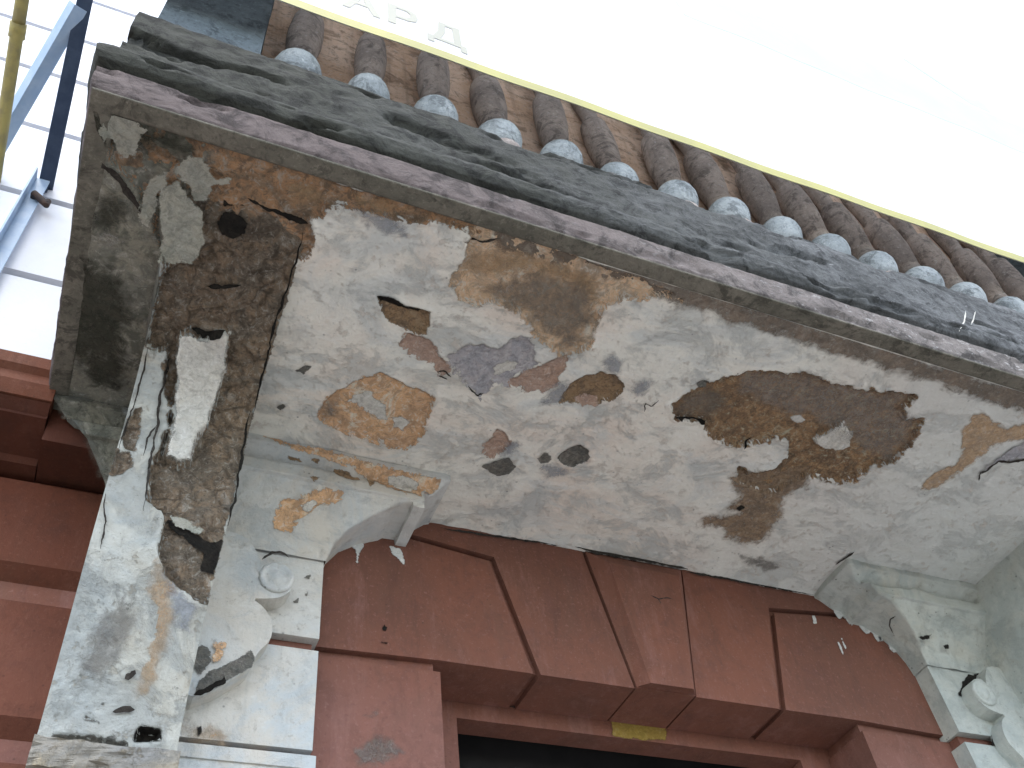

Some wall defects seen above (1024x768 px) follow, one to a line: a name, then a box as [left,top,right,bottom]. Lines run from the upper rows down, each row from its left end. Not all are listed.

crack [101,163,141,213]
spalling [98,115,683,604]
crack [119,347,169,511]
spalling [671,370,925,543]
peeling [922,414,1024,490]
crack [99,494,107,549]
spalling [194,641,255,695]